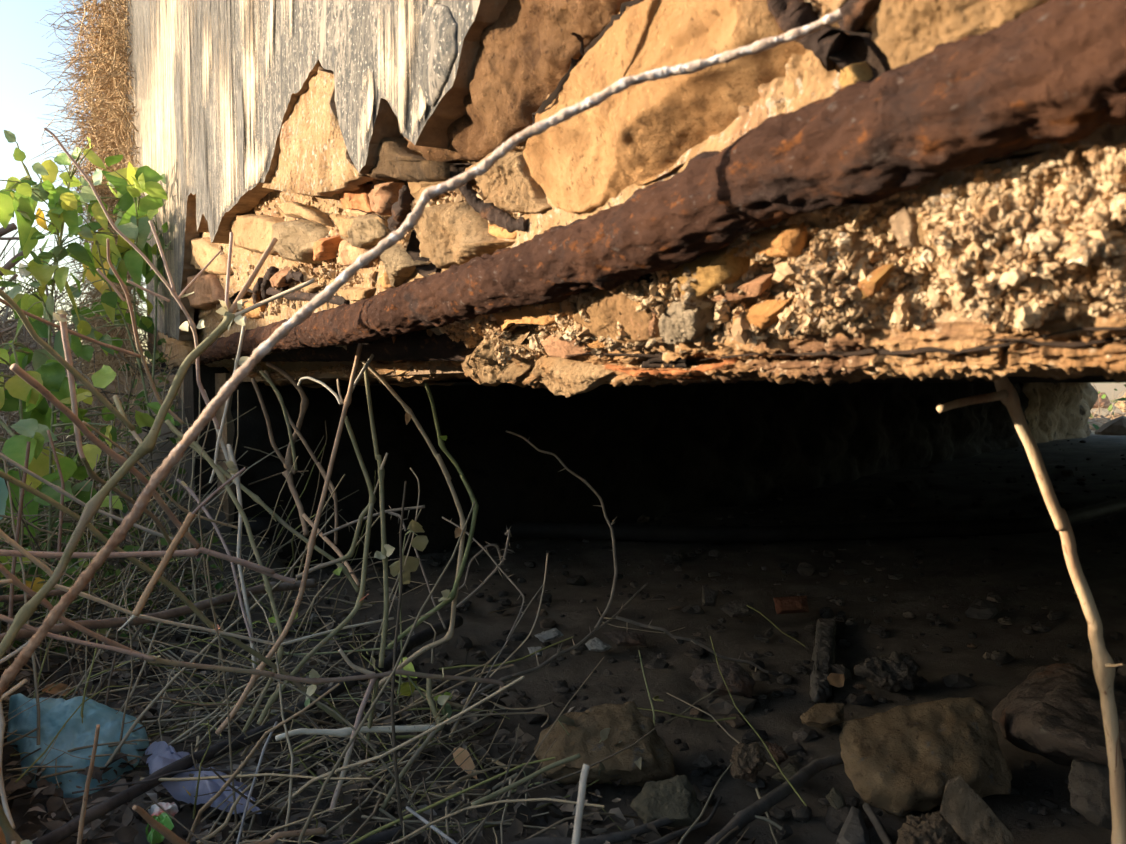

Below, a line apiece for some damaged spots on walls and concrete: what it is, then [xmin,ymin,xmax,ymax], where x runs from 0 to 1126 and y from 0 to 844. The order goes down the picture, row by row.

spalling [128,0,1126,398]
rust [605,359,737,380]